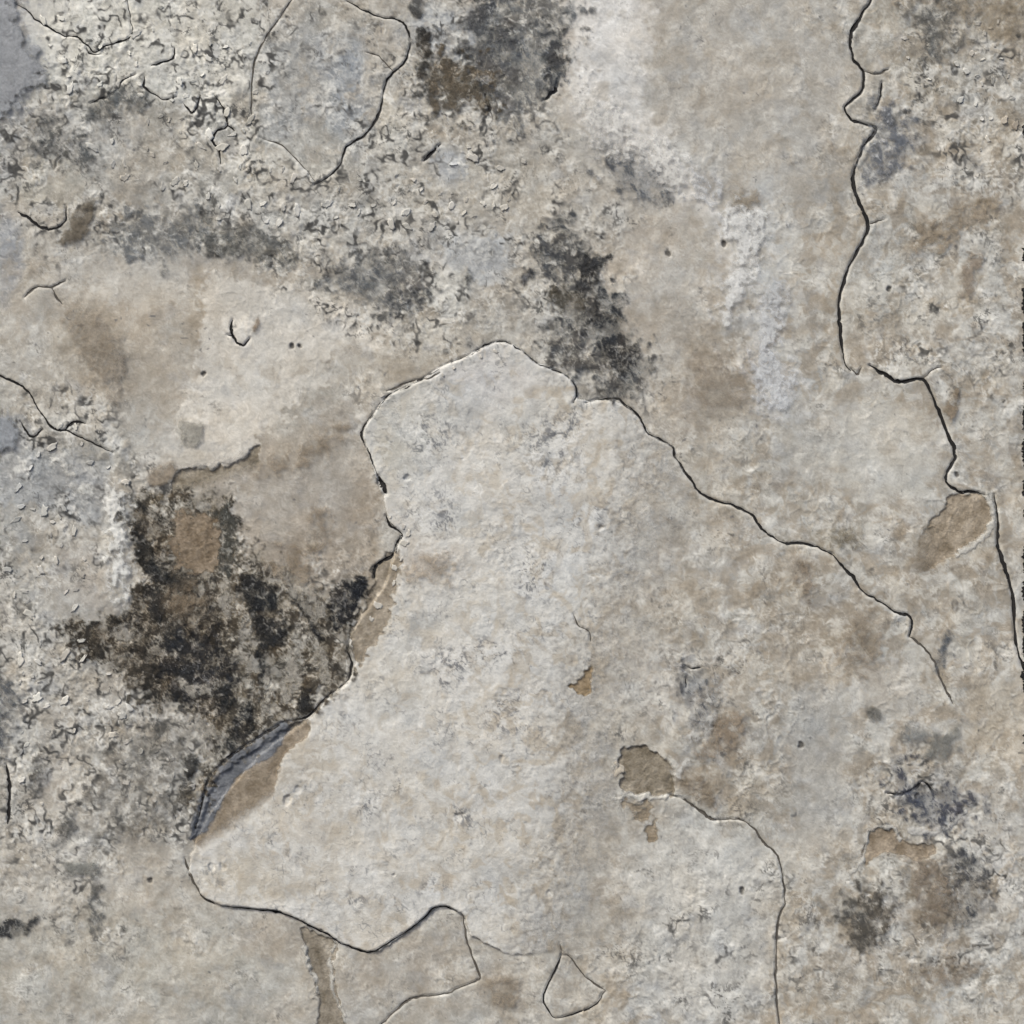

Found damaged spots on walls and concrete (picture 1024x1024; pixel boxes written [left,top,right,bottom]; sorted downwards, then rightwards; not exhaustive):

crack [262,1,411,185]
leakage [405,0,595,141]
crack [0,375,112,452]
leakage [521,210,656,404]
crack [837,0,1024,671]
crack [360,340,954,705]
flaking render [922,493,996,571]
leakage [51,801,77,844]
peeling [108,732,188,818]
leakage [51,458,374,835]
peeling [189,342,685,1024]
crack [184,858,481,1024]